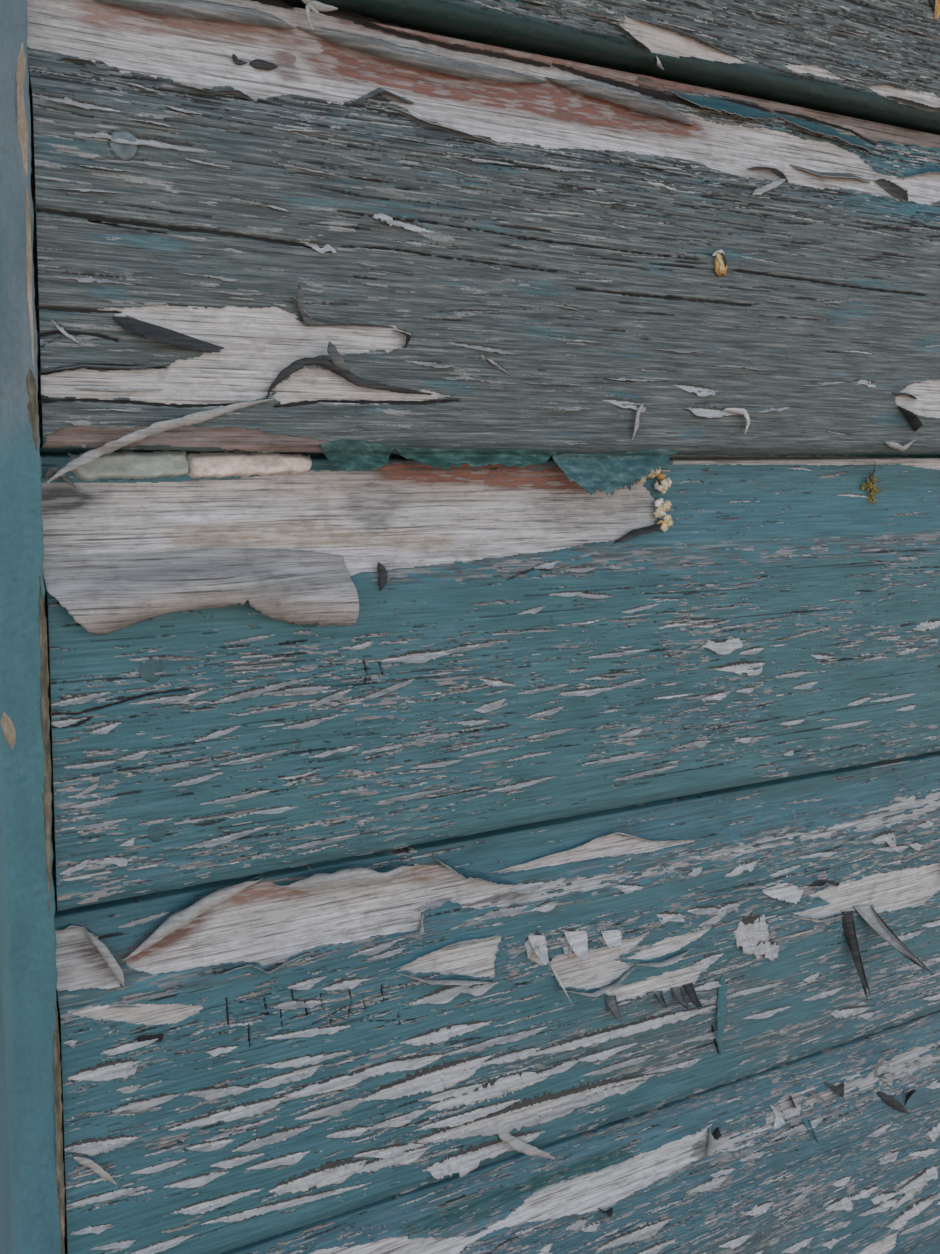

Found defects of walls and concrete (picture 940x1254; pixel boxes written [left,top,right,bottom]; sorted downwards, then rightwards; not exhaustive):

peeling [16,0,940,450]
peeling [38,449,679,911]
peeling [704,638,763,700]
peeling [777,673,814,689]
peeling [826,721,870,729]
peeling [850,695,915,711]
peeling [879,621,940,655]
peeling [55,788,940,1019]
peeling [53,905,781,1254]
peeling [297,1041,940,1254]